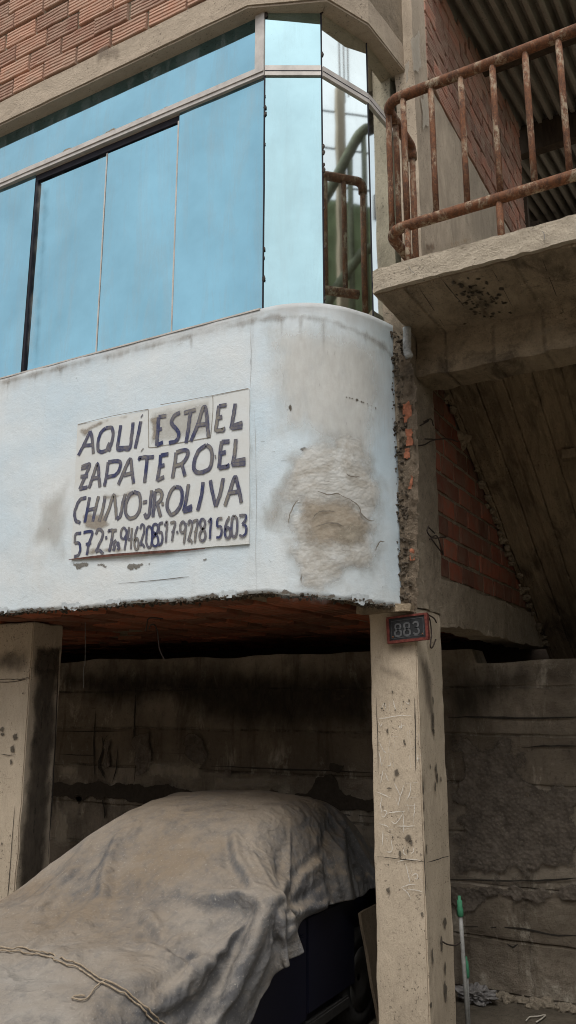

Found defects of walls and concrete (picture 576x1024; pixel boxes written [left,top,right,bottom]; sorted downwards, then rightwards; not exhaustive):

flaking render [0,331,419,617]
water stain [20,650,371,887]